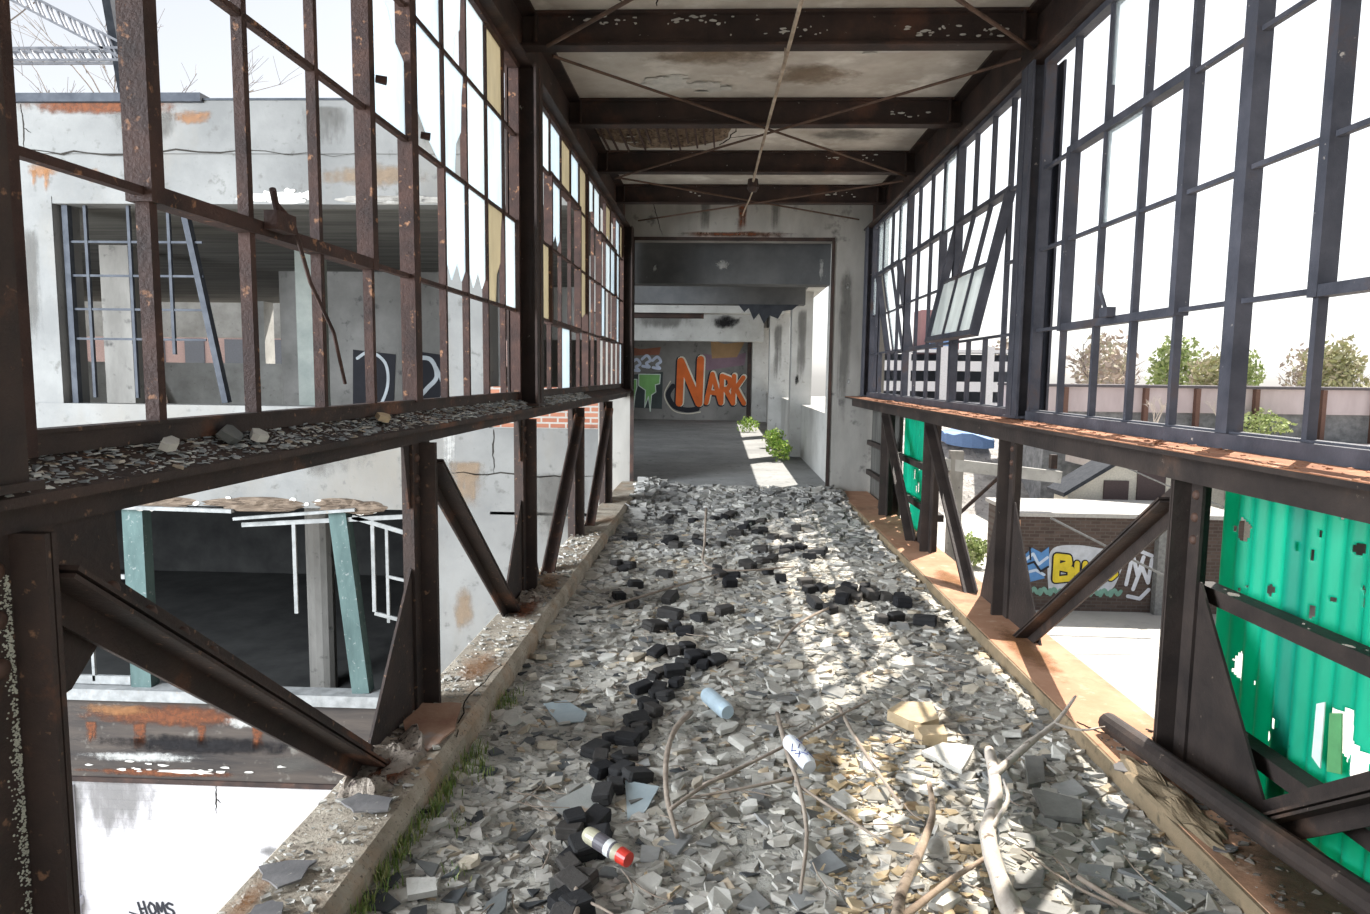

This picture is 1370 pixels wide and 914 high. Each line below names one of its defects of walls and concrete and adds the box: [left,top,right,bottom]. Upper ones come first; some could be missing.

peeling [667,0,746,25]
peeling [904,25,1009,37]
water stain [659,52,762,62]
water stain [777,67,841,82]
corrosion [40,103,121,114]
corrosion [161,103,208,123]
corrosion [32,166,52,187]
corrosion [86,706,262,747]